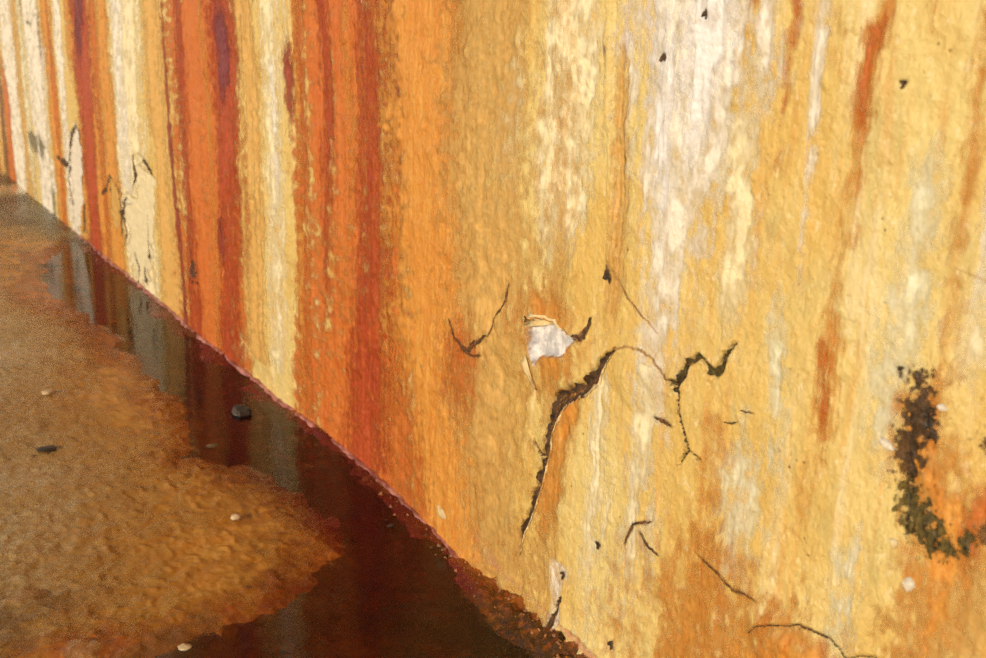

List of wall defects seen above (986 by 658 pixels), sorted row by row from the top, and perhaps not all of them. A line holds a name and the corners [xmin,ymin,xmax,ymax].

corrosion [789,0,801,46]
corrosion [854,0,895,148]
corrosion [603,44,629,314]
corrosion [0,0,596,658]
crack [448,285,509,357]
spalling [520,313,576,390]
crack [519,258,737,556]
corrosion [817,310,839,442]
crack [700,557,753,600]
corrosion [720,602,825,658]
crack [748,624,875,658]